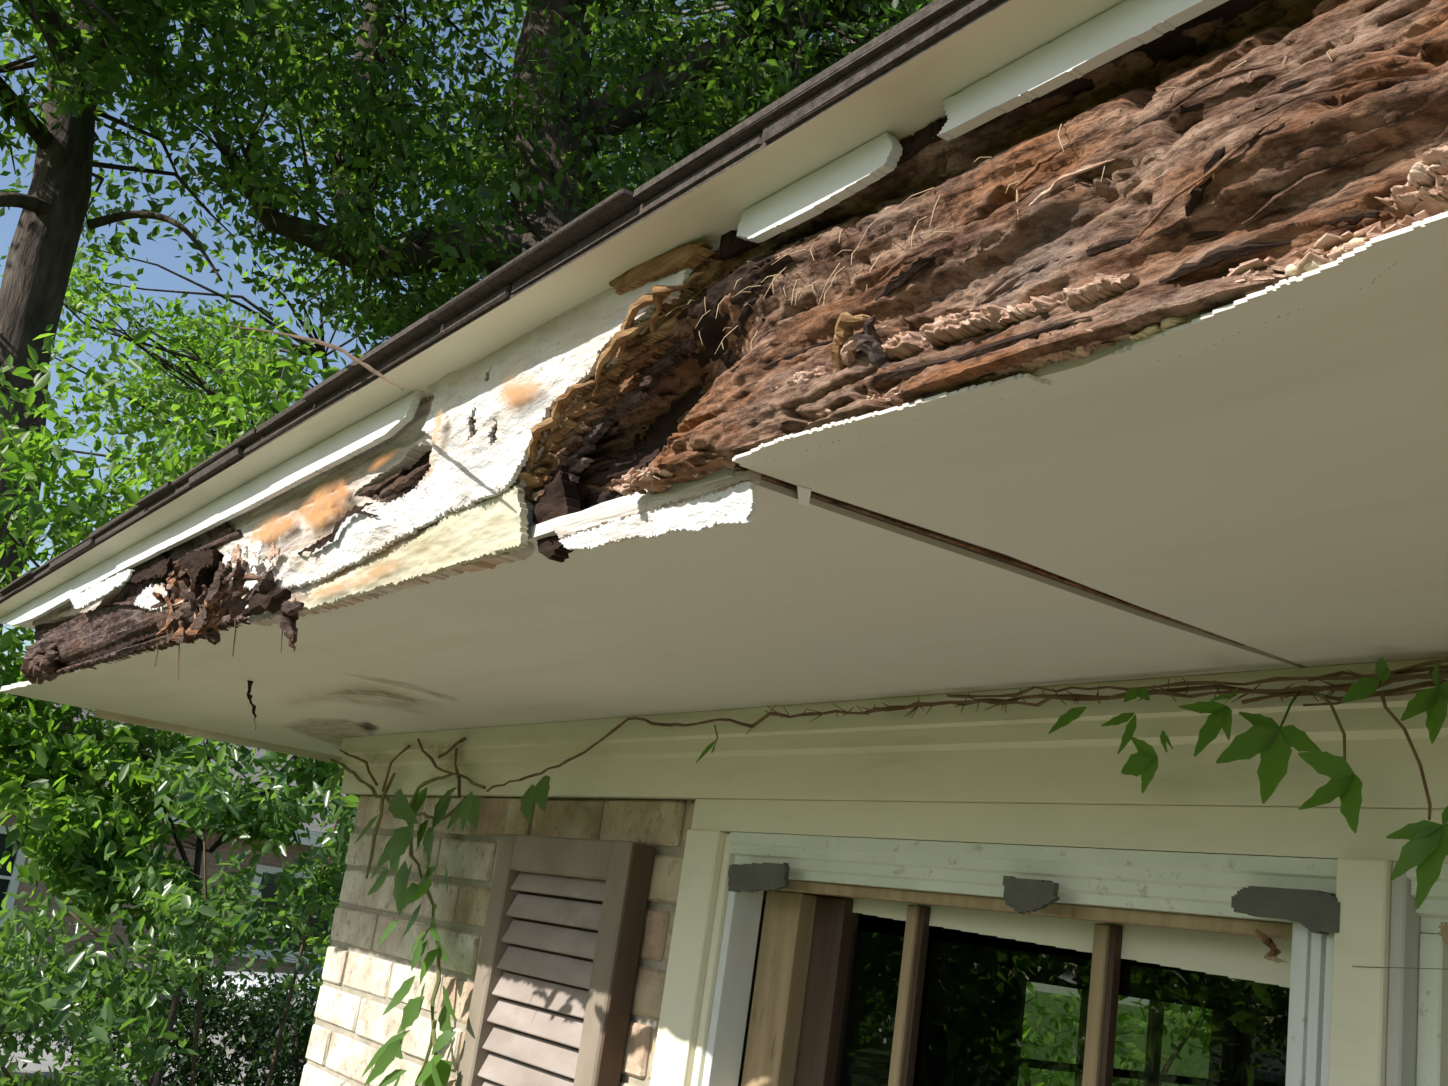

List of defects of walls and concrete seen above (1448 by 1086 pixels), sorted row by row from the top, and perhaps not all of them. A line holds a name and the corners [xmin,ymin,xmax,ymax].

peeling [1113,211,1448,366]
peeling [129,241,729,644]
peeling [552,373,1051,550]
crack [729,463,1244,646]
peeling [1438,922,1448,945]